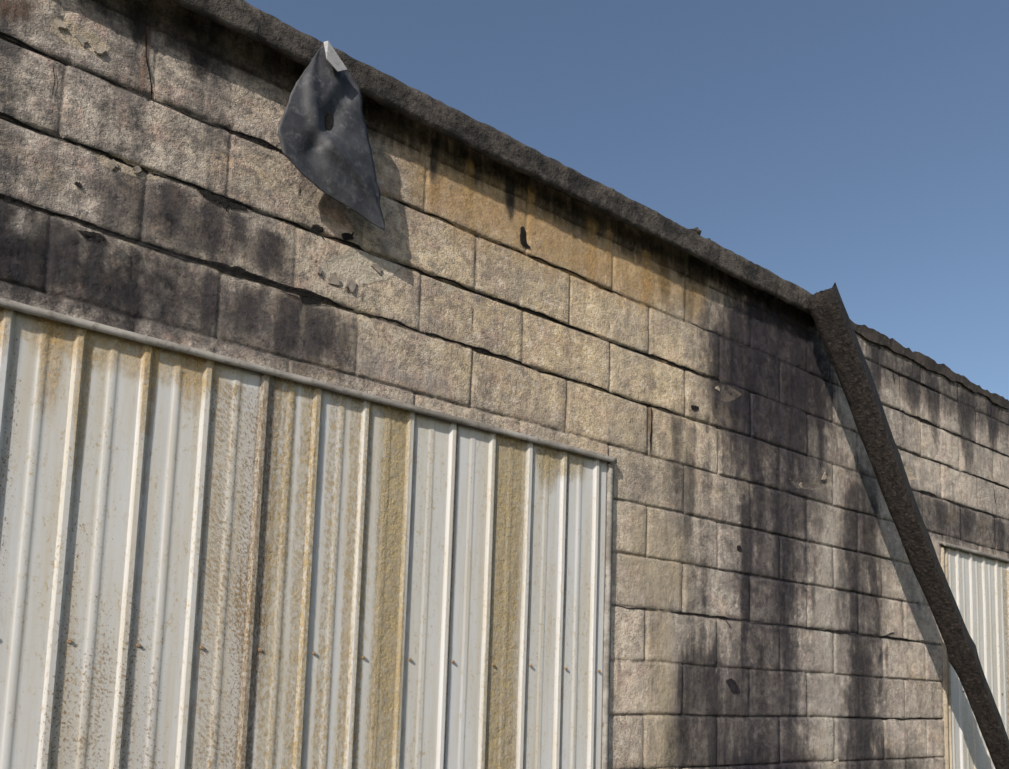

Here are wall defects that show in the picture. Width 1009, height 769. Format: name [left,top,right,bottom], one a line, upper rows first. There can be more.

crack [0,31,282,152]
water stain [93,0,304,92]
water stain [0,204,342,367]
corrosion [36,316,409,769]
corrosion [483,433,526,769]
corrosion [537,444,582,484]
water stain [362,96,832,769]
water stain [844,472,885,769]
water stain [870,343,1009,461]
water stain [917,492,1009,550]